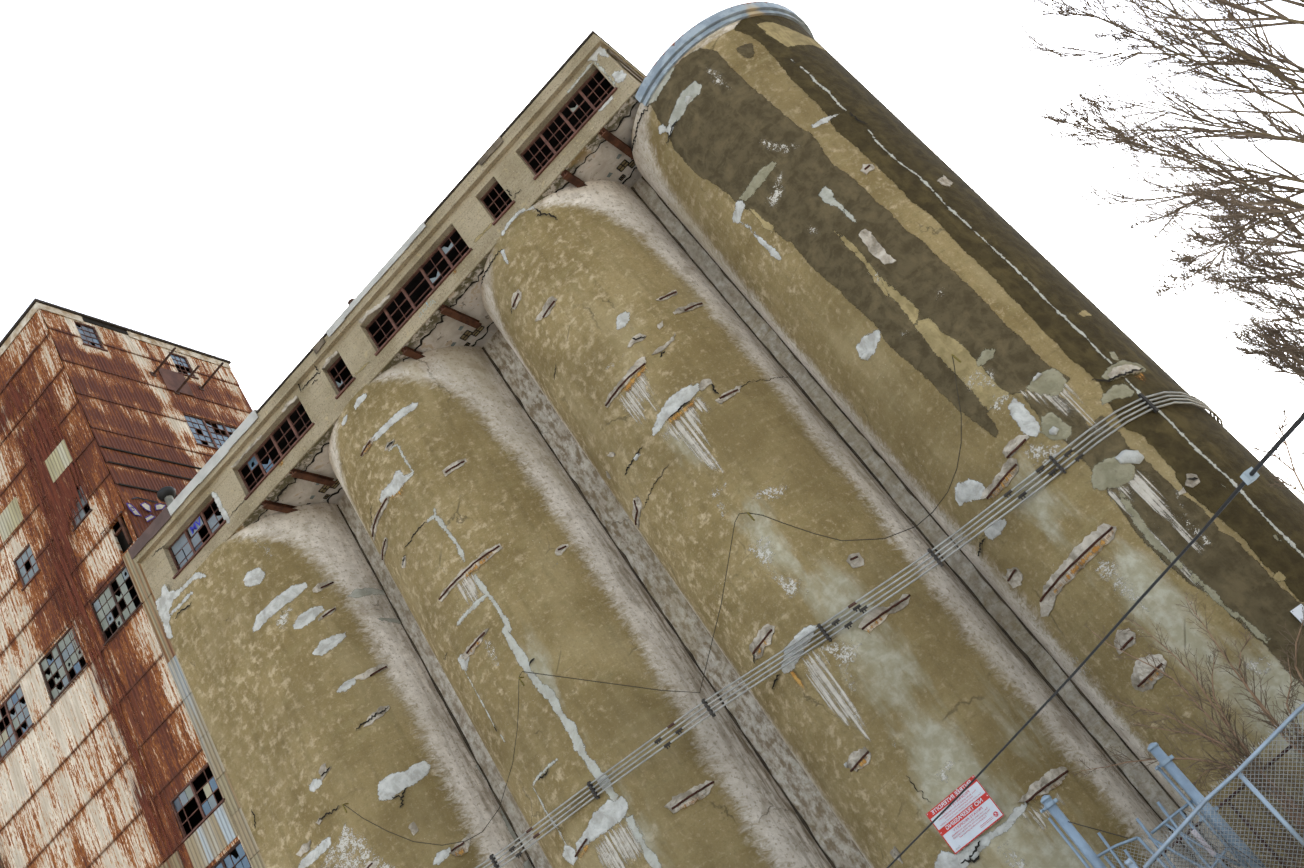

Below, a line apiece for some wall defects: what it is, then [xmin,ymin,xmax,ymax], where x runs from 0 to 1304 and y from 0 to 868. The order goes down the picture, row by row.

spalling [605,281,703,408]
water stain [650,15,1304,679]
water stain [620,373,656,424]
spalling [980,426,1067,499]
spalling [438,543,503,602]
spalling [1039,523,1147,617]
corrosion [0,374,183,862]
spalling [822,594,911,688]
spalling [1114,629,1167,692]
spalling [843,747,871,772]
spalling [664,780,714,814]
water stain [596,824,642,868]